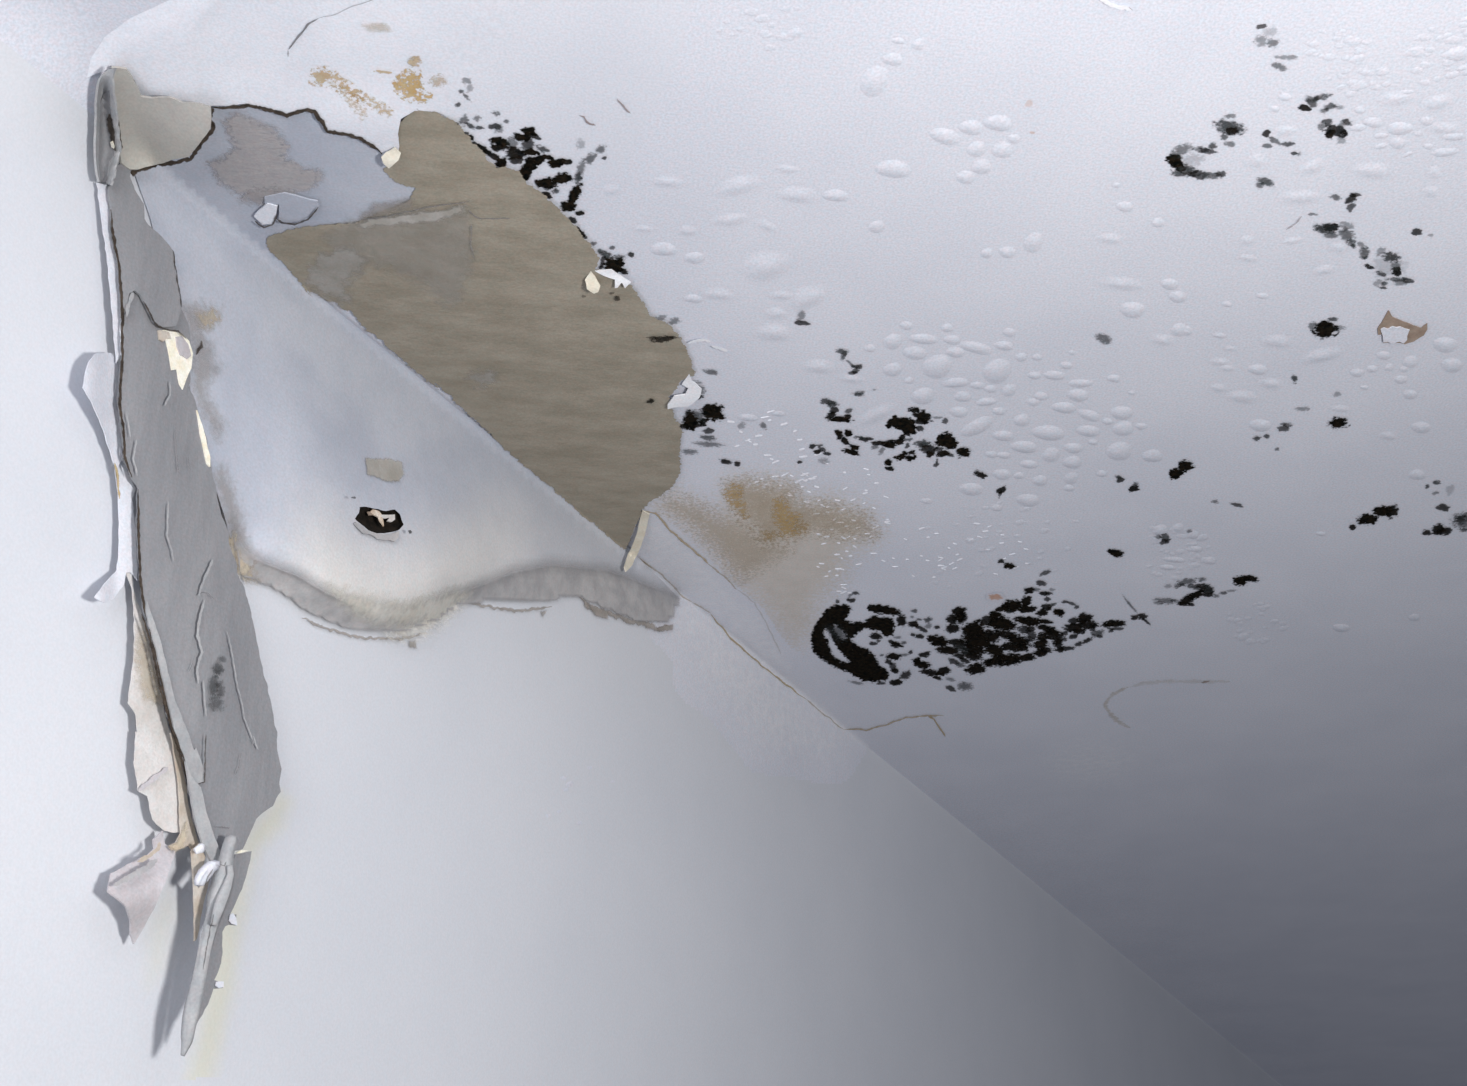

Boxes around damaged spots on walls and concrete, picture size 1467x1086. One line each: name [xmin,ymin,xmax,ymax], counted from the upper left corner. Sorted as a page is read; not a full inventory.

crack [288,19,317,50]
rust [309,66,364,102]
rust [374,56,433,103]
leakage [1298,94,1352,139]
leakage [1165,120,1244,180]
leakage [455,90,634,275]
leakage [1316,193,1415,289]
peeling [1377,310,1427,344]
leakage [797,399,1006,496]
flaking render [82,0,702,1056]
leakage [1349,504,1399,530]
leakage [810,570,1151,692]